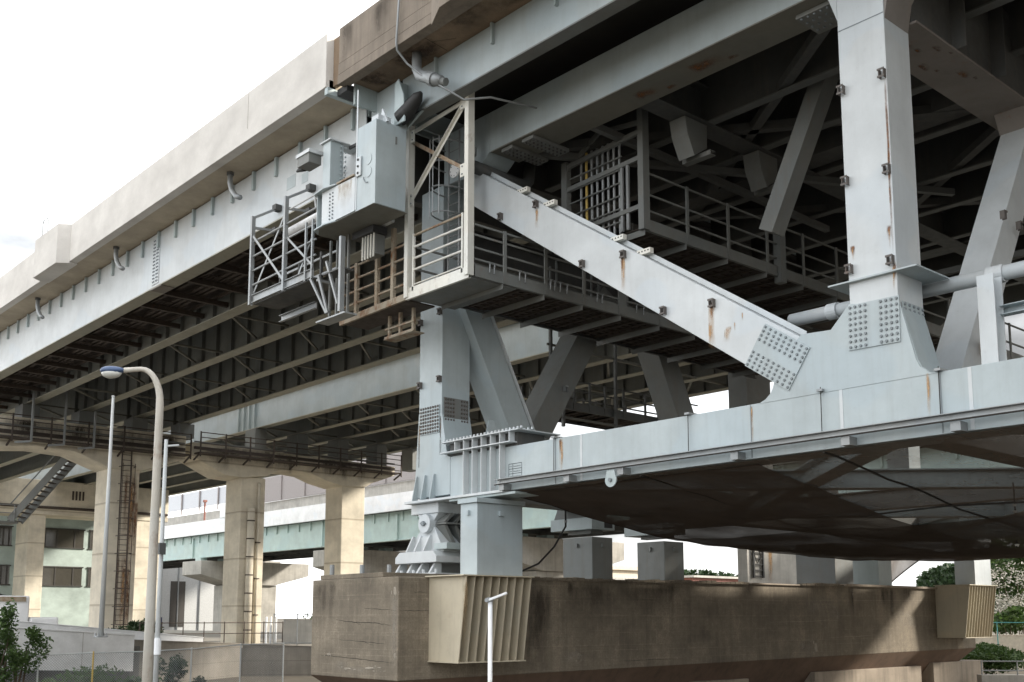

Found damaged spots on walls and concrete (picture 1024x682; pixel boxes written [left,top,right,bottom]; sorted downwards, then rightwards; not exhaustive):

rust [124,479,138,537]